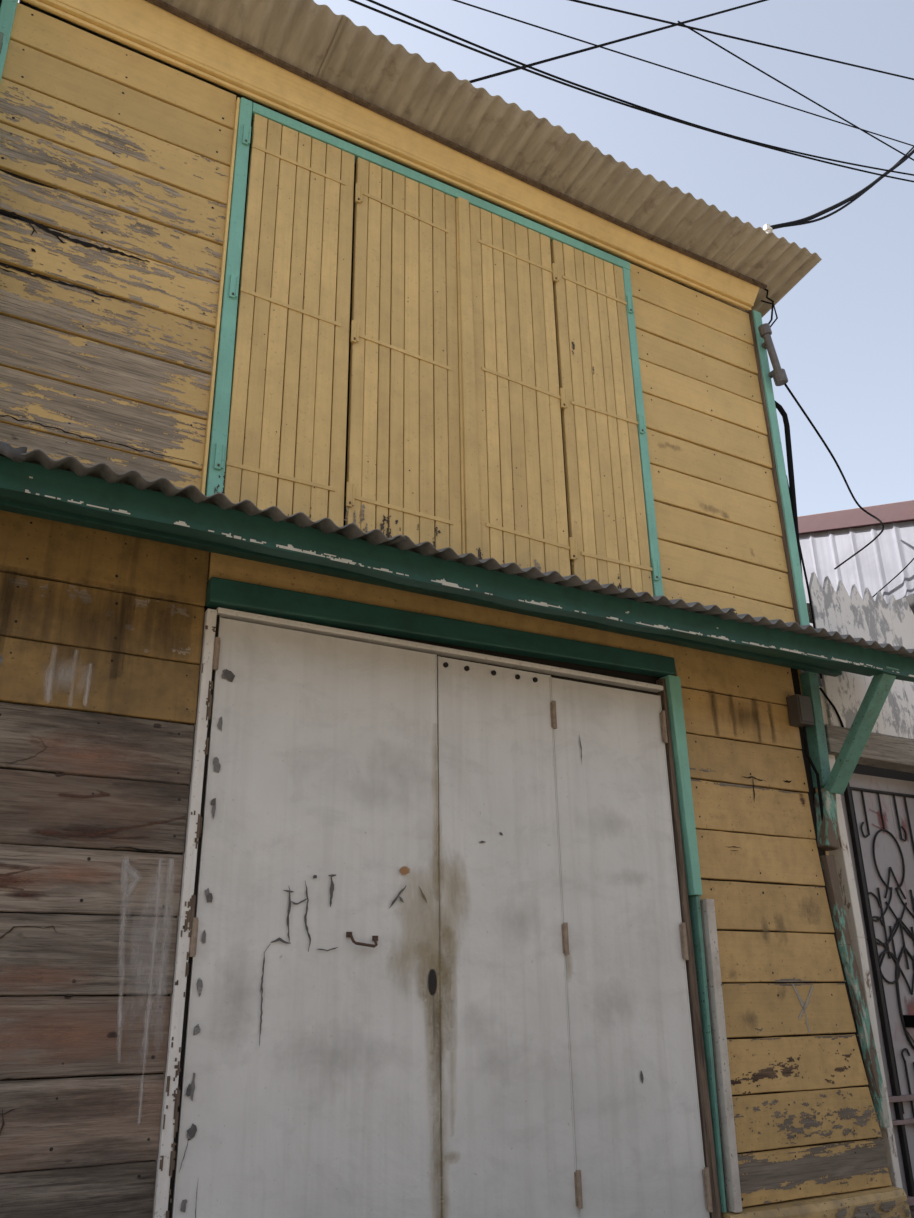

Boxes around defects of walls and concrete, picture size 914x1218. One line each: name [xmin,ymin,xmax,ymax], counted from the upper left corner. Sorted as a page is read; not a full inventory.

crack [0,209,149,303]
peeling [0,87,227,489]
peeling [25,476,130,514]
peeling [208,530,409,576]
peeling [431,579,493,595]
peeling [606,611,914,677]
crack [0,926,56,939]
peeling [731,1028,889,1204]
spalling [824,1200,911,1218]